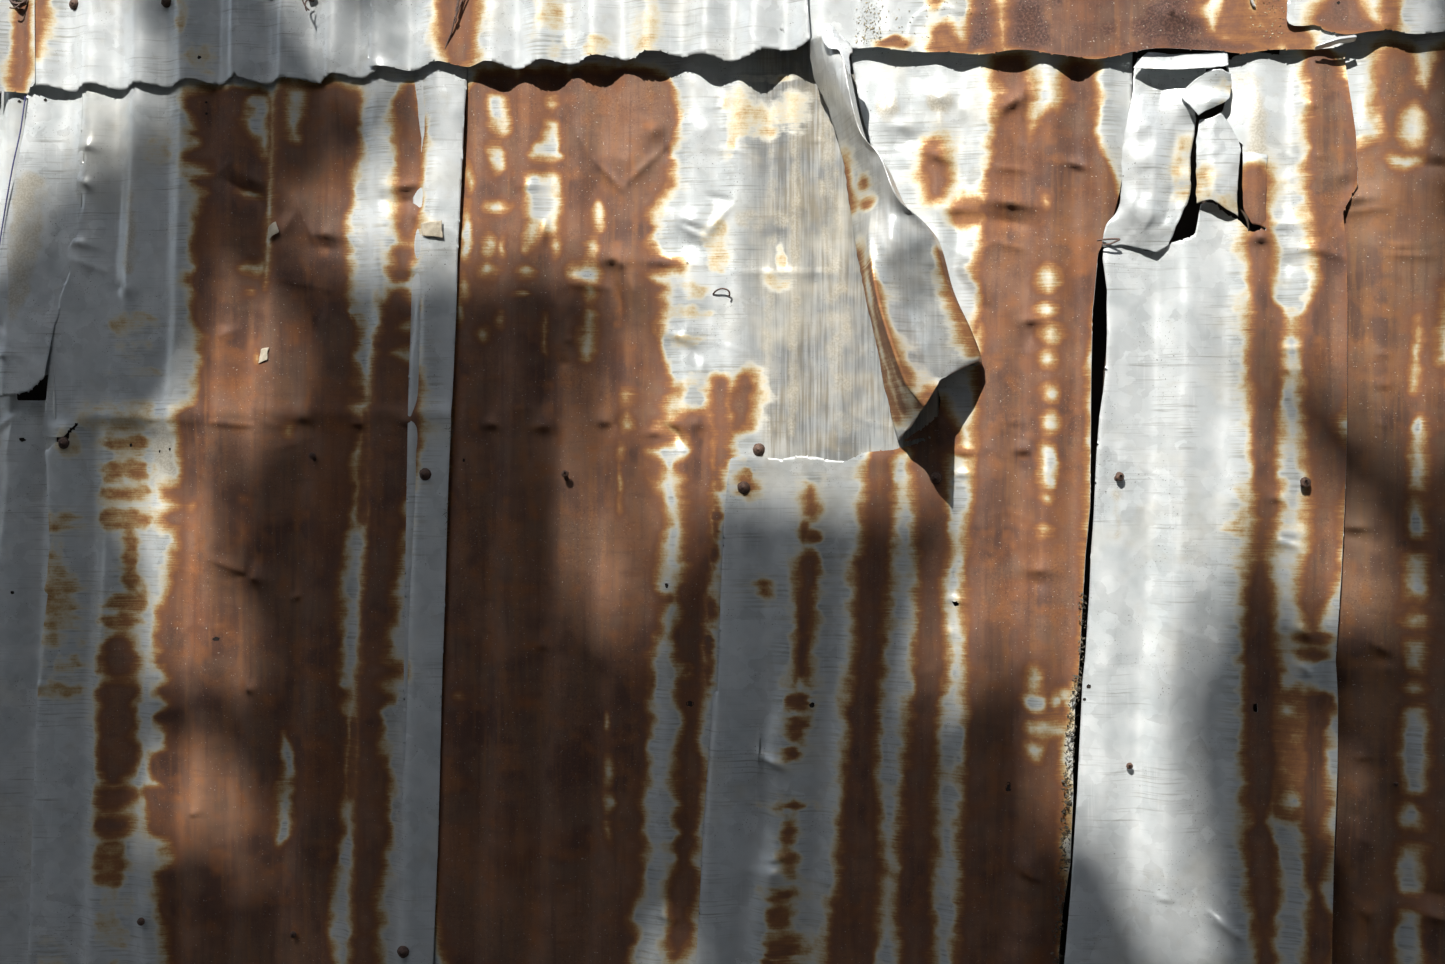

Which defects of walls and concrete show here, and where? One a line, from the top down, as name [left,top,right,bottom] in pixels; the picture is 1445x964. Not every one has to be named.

rust [37,0,1124,964]
peeling [808,23,982,440]
rust [1143,0,1445,964]